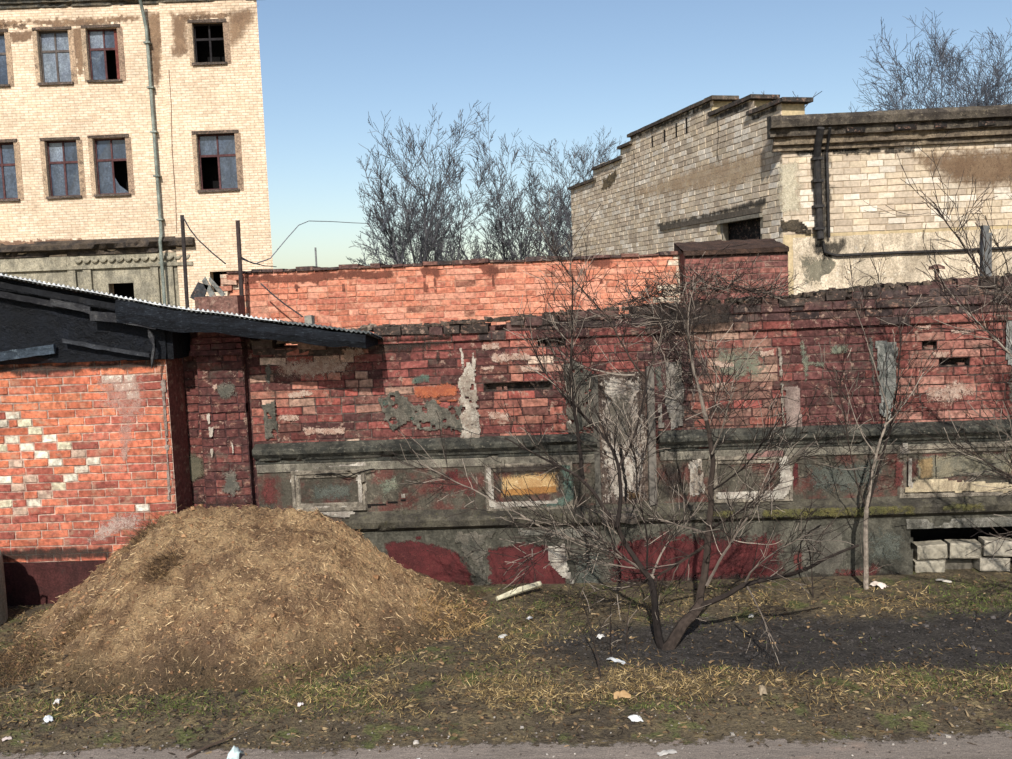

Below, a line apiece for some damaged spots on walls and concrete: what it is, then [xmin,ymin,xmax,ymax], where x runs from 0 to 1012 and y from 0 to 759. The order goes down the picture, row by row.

leakage [229,9,252,43]
leakage [777,147,1012,284]
spalling [538,338,566,347]
peeling [378,343,553,438]
peeling [563,360,594,434]
peeling [221,469,240,497]
peeling [384,491,802,586]